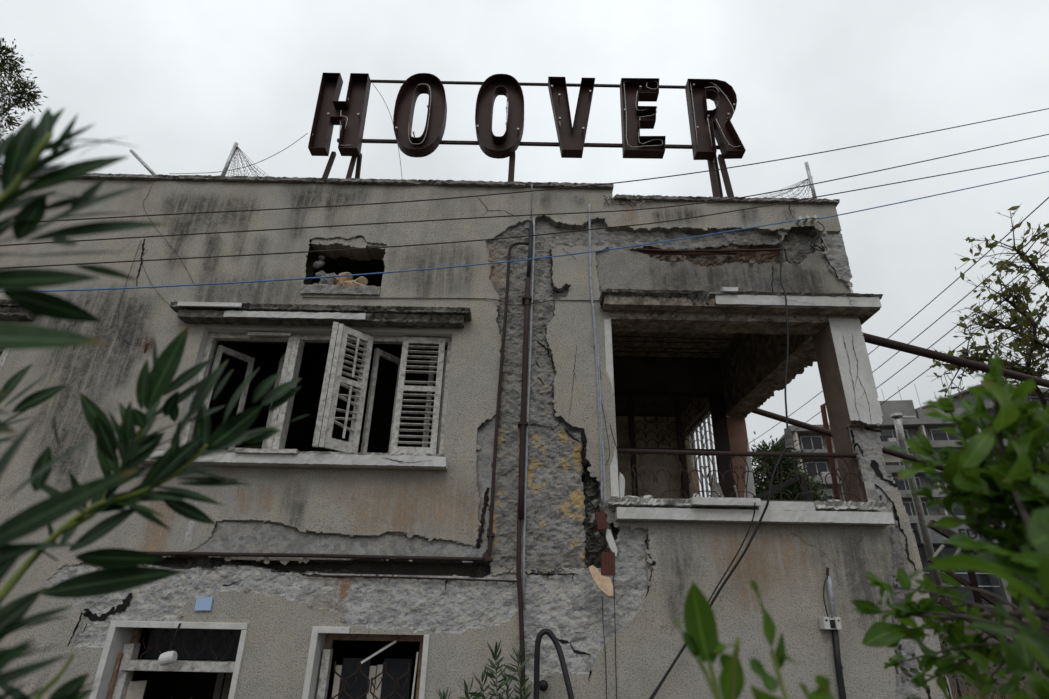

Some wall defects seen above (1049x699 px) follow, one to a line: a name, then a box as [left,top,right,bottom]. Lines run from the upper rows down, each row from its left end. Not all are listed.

spalling [70,212,853,683]
crack [843,335,926,571]
spalling [42,562,107,588]
crack [67,593,132,646]
crack [150,488,579,591]
crack [926,675,962,699]